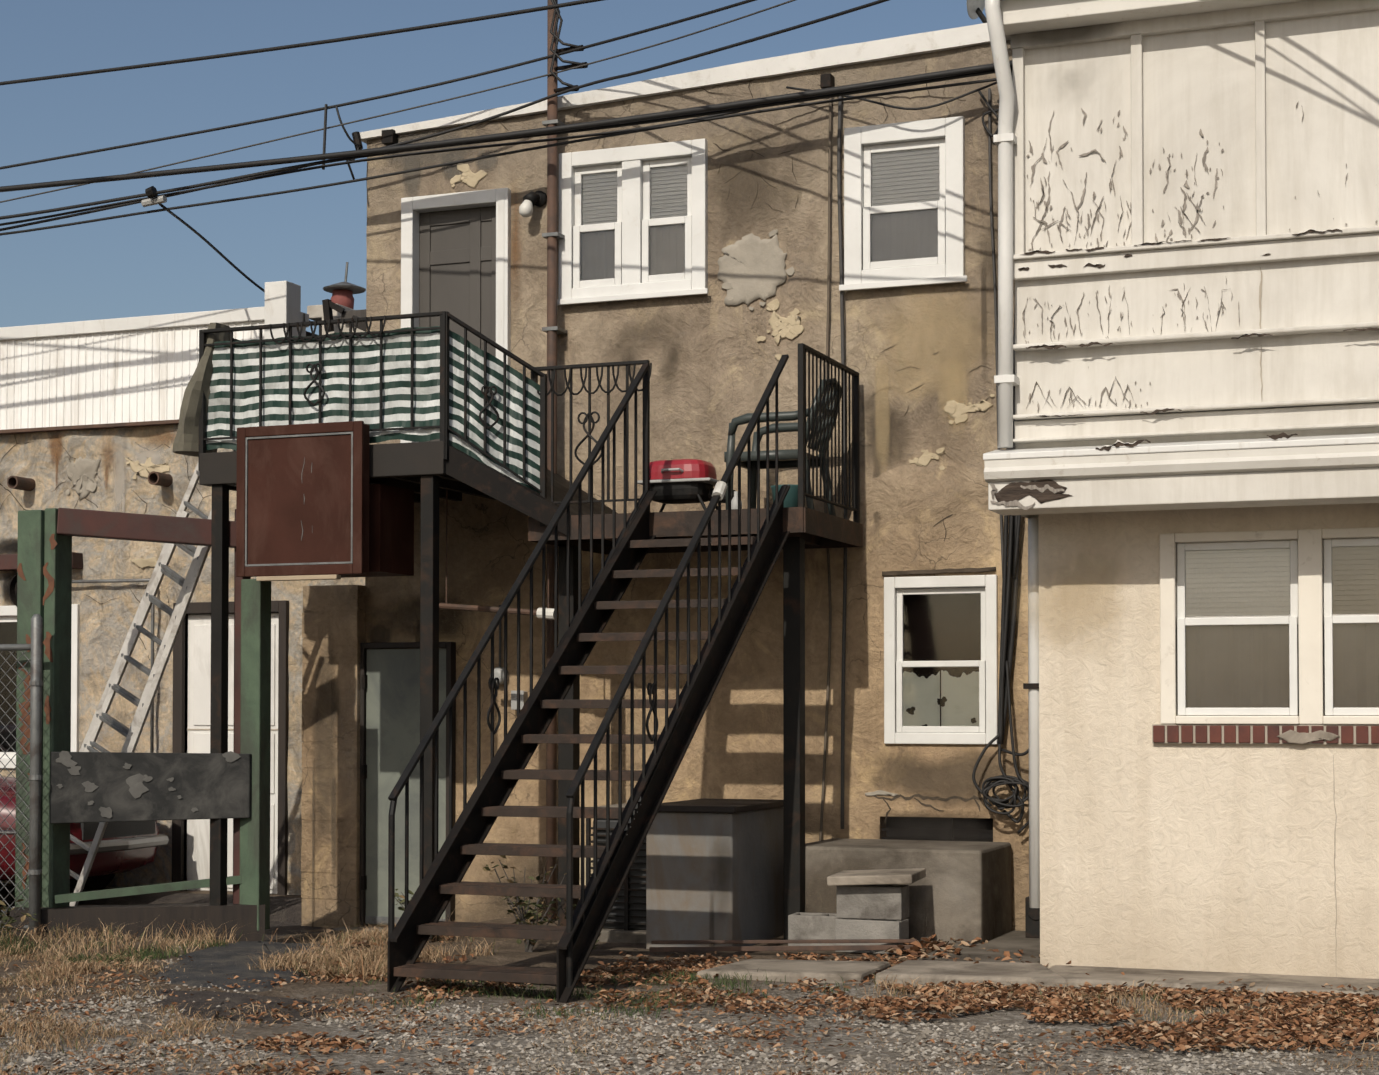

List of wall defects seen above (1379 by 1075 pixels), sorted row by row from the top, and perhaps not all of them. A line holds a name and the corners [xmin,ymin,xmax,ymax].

peeling [450,163,488,193]
peeling [1018,108,1227,270]
peeling [749,294,804,360]
peeling [1022,285,1132,350]
peeling [1153,276,1271,339]
flaking render [944,394,995,425]
peeling [1026,377,1182,418]
crack [0,435,101,510]
crack [132,442,211,517]
flaking render [909,448,946,470]
peeling [990,483,1065,510]
crack [1331,755,1339,977]